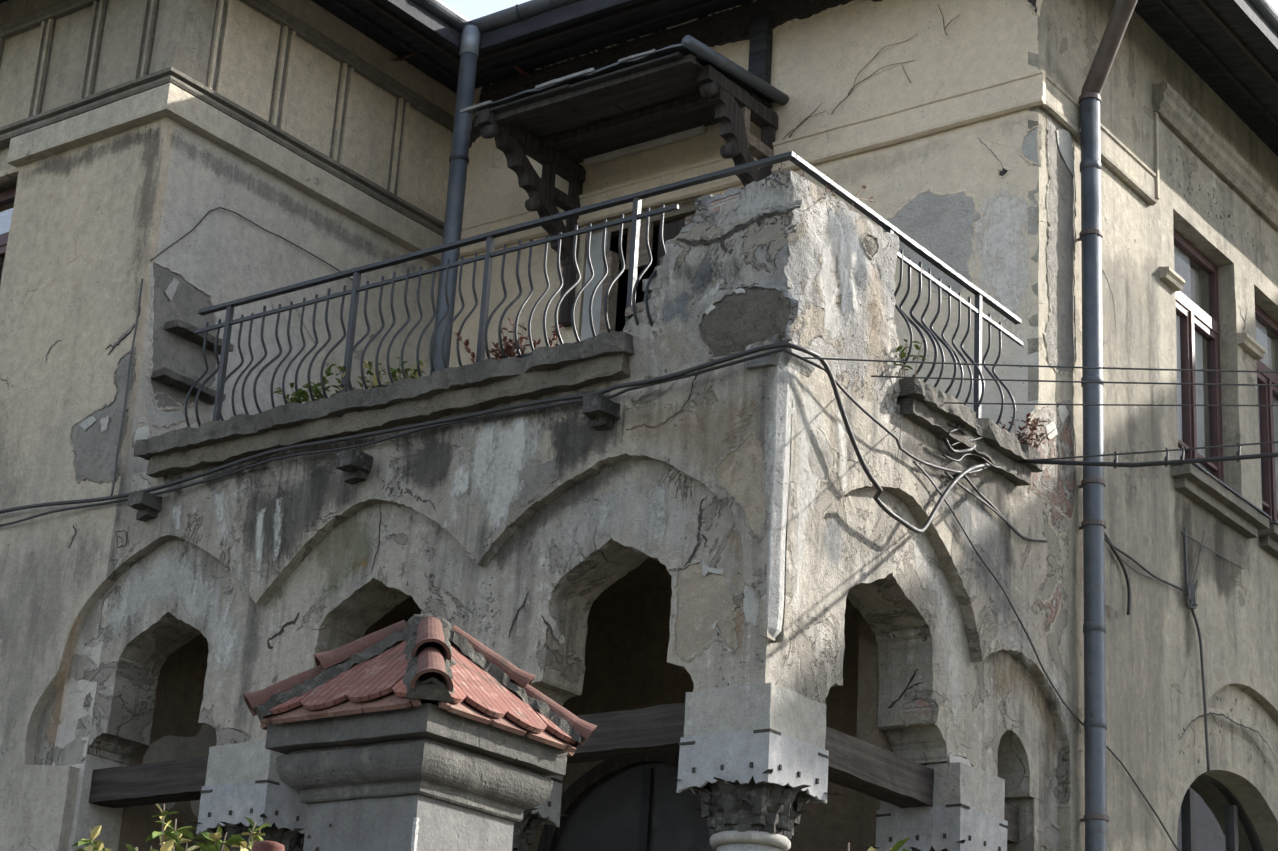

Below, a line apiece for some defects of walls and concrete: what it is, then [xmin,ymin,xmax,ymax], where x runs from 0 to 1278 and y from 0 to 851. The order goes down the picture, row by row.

flaking render [1024,0,1043,17]
flaking render [469,0,897,153]
peeling [858,186,982,300]
peeling [69,261,218,485]
flaking render [697,282,799,361]
leakage [165,436,375,553]
leakage [256,490,285,580]
leakage [451,390,623,526]
crack [678,497,707,570]
flaking render [1024,397,1078,537]
flaking render [1035,580,1063,636]